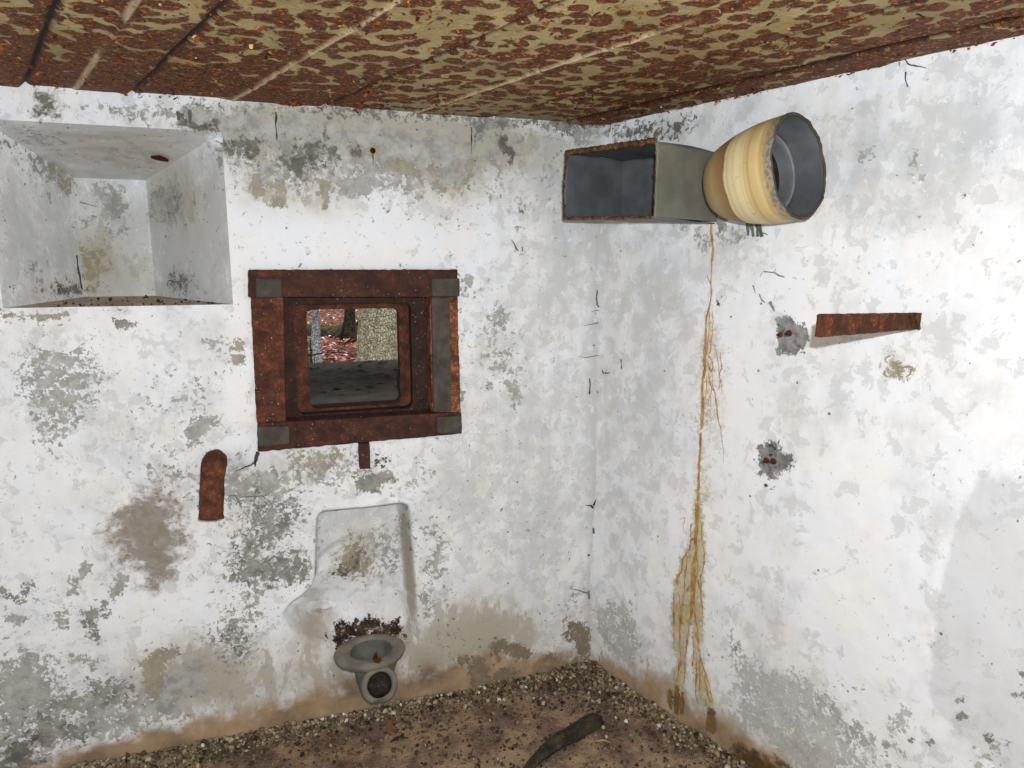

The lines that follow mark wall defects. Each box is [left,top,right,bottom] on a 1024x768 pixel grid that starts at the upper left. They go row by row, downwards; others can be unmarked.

rust [0,0,855,128]
rust [943,0,1024,53]
rust [562,137,658,220]
spalling [775,315,810,356]
peeling [7,336,112,459]
peeling [183,414,220,448]
rust [667,224,724,734]
spalling [756,439,796,490]
leakage [106,492,186,591]
peeling [0,560,182,748]
leakage [452,636,556,687]
leakage [560,617,592,663]